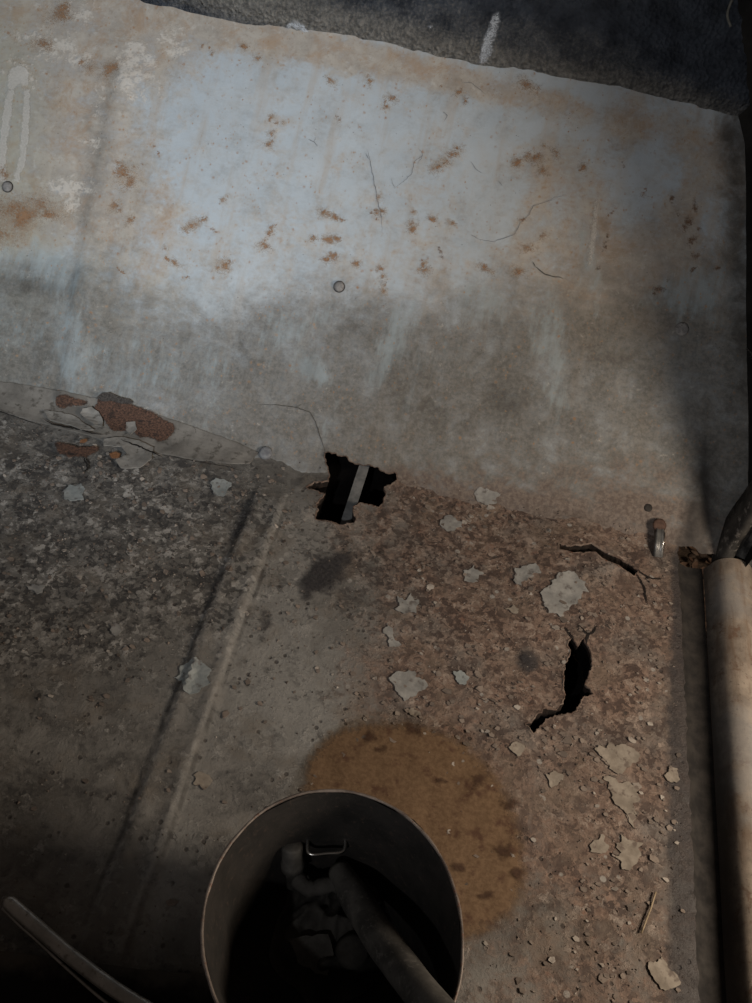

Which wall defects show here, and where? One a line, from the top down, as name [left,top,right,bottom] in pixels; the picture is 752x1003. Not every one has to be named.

rust [310,236,340,262]
peeling [43,392,174,474]
spalling [307,452,397,524]
crack [558,542,661,605]